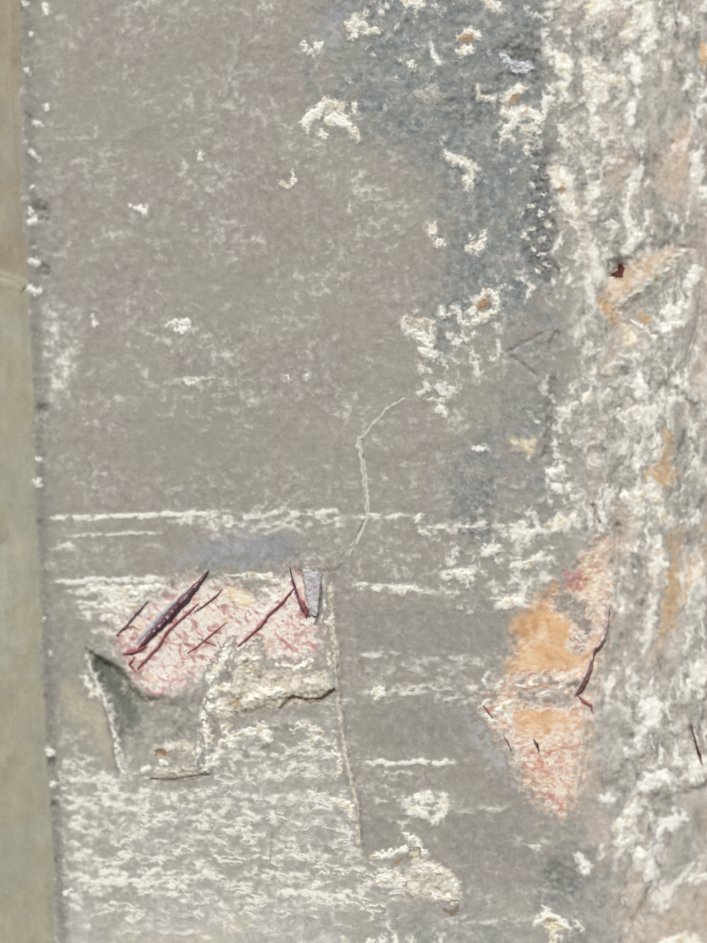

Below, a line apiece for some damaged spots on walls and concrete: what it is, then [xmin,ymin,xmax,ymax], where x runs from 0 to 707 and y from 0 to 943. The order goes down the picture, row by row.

crack [339,396,405,565]
water stain [108,605,233,697]
water stain [163,508,316,661]
peeling [482,522,548,612]
water stain [548,586,601,658]
water stain [56,669,134,776]
spalling [76,641,220,784]
peeling [476,669,565,727]
water stain [455,699,586,818]
water stain [532,841,586,906]
water stain [97,897,270,943]